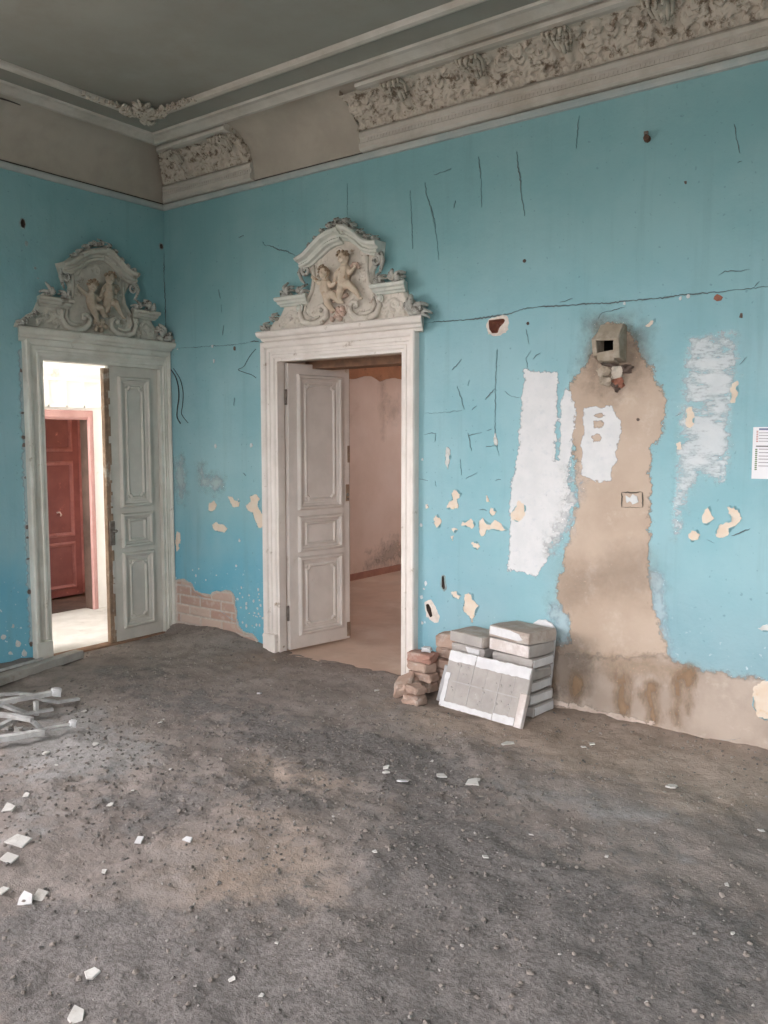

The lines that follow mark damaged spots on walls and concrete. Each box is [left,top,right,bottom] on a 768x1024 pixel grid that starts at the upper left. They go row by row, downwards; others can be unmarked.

crack [410,169,456,255]
crack [517,155,525,216]
spalling [486,314,509,336]
crack [428,270,768,367]
crack [424,350,520,481]
peeling [420,489,526,550]
flaking render [550,322,670,660]
peeling [688,505,742,542]
spalling [175,568,264,642]
spalling [553,698,655,725]
water stain [552,643,768,749]
peeling [752,679,768,721]